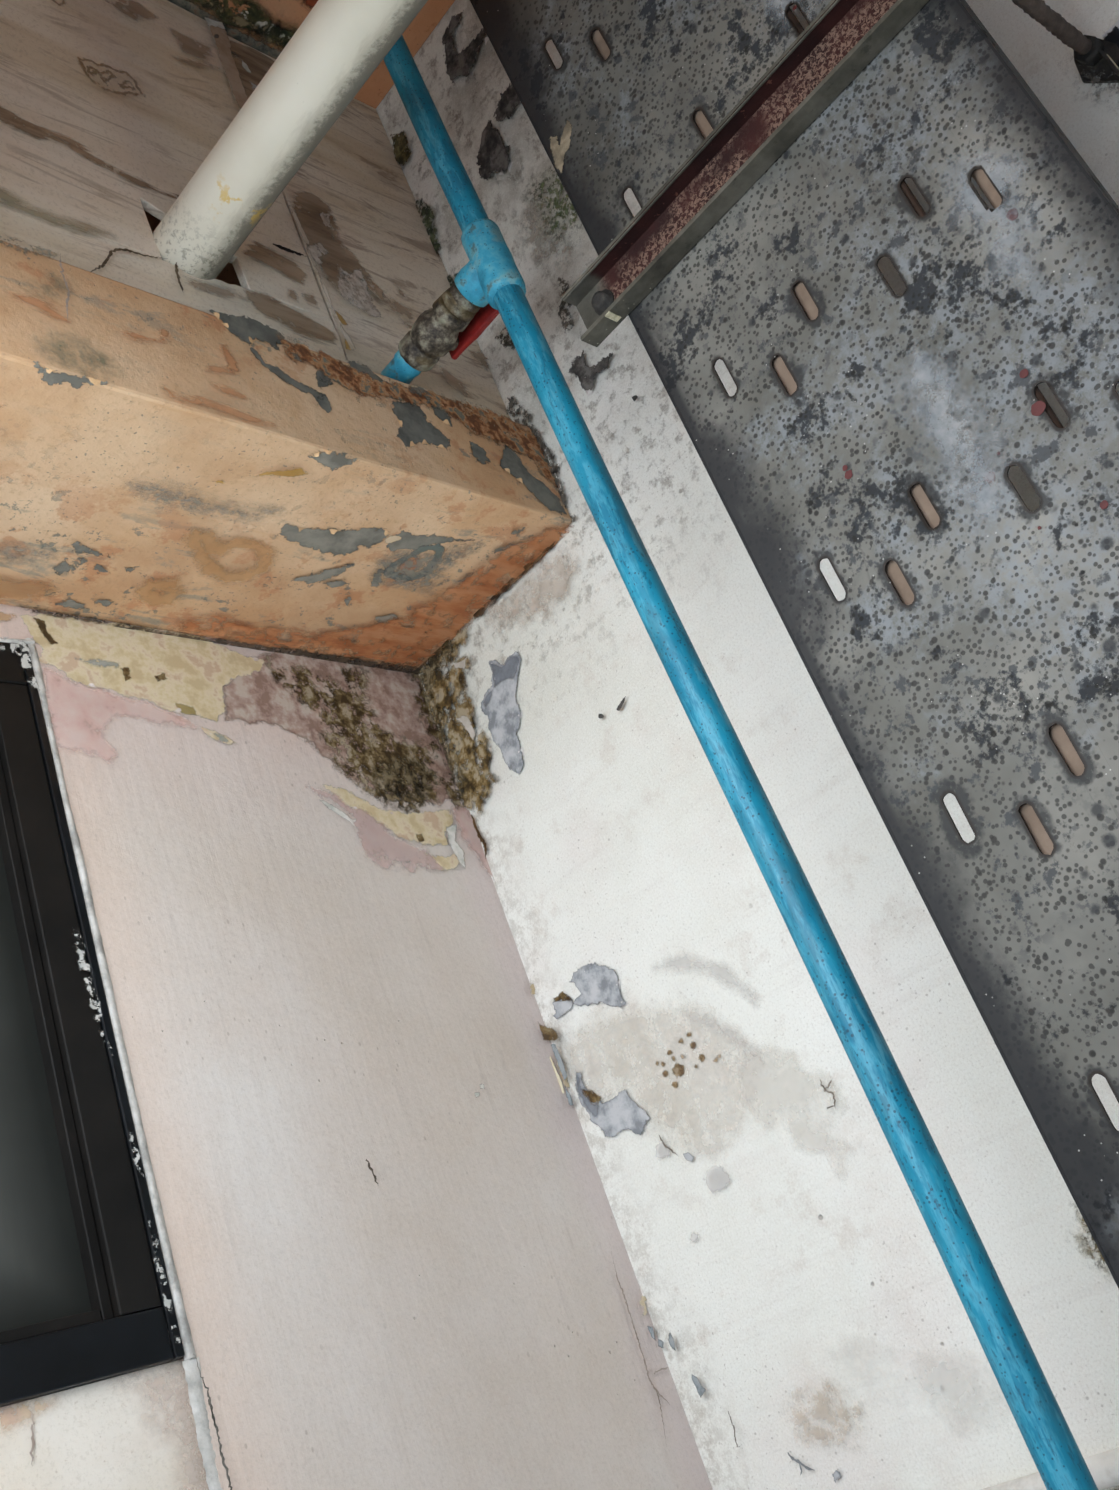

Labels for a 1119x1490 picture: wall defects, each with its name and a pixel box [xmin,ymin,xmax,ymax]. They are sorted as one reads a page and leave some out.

peeling [442,10,489,83]
peeling [477,83,520,180]
crack [59,248,184,321]
peeling [33,361,108,389]
flaking render [209,309,567,515]
peeling [275,524,474,605]
peeling [19,541,265,745]
water stain [0,579,499,814]
peeling [481,651,524,774]
peeling [557,1062,650,1137]
water stain [539,1016,742,1161]
water stain [1076,1210,1108,1270]